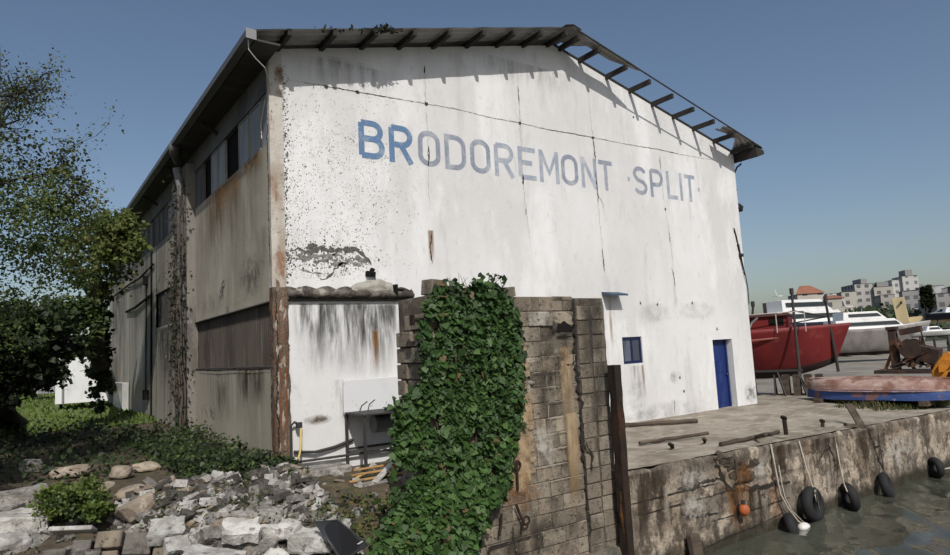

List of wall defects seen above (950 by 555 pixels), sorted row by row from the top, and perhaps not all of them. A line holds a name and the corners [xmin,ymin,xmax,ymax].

spalling [275,66,419,457]
leakage [344,304,364,339]
leakage [777,445,786,476]